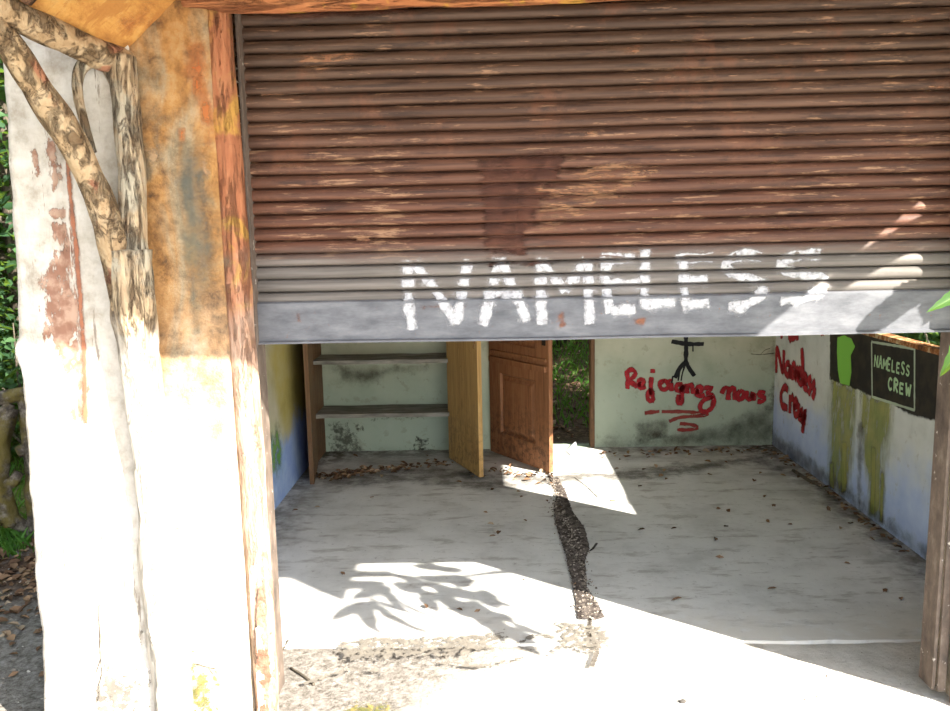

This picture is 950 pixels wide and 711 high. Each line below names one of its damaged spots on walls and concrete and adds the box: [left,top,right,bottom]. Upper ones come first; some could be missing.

corrosion [263,7,415,19]
peeling [31,138,62,192]
corrosion [478,154,563,267]
peeling [38,207,90,422]
crack [543,472,619,667]